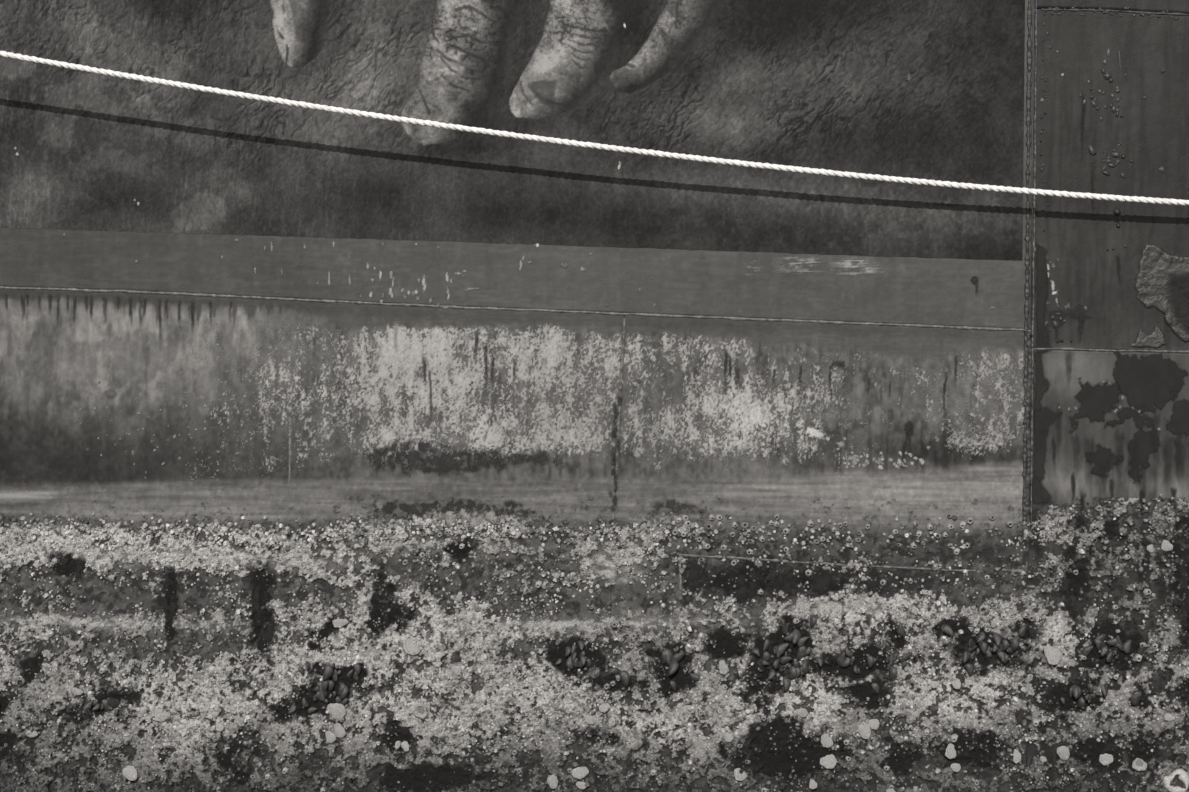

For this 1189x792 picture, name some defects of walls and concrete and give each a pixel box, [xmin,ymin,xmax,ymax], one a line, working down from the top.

damp [21,296,194,324]
peeling [1130,244,1189,349]